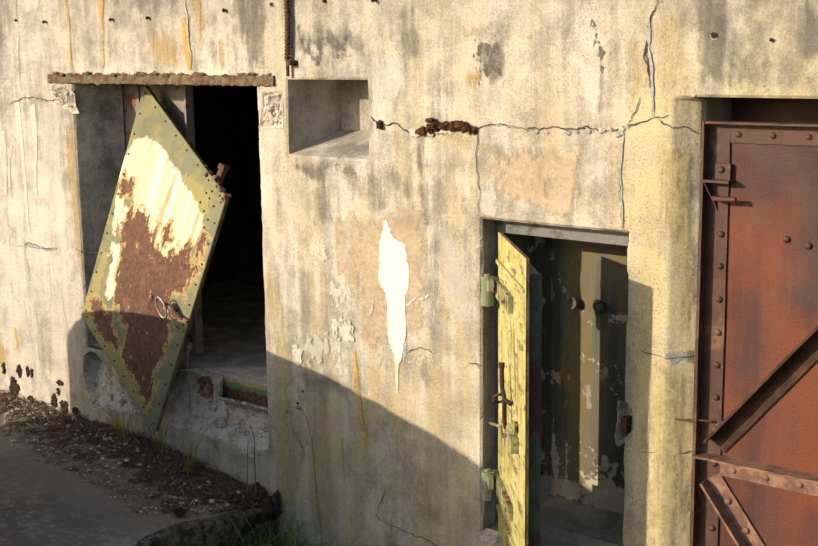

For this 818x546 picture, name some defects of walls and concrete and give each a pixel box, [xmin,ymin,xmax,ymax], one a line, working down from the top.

crack [3,0,58,104]
water stain [473,39,503,85]
spalling [258,89,284,130]
corrosion [408,118,478,138]
crack [475,0,697,231]
flaking render [291,206,434,393]
spalling [0,362,150,498]
spalling [81,343,142,414]
spalling [162,368,271,458]
spalling [615,401,635,447]
spalling [128,482,282,532]
crack [372,494,436,546]